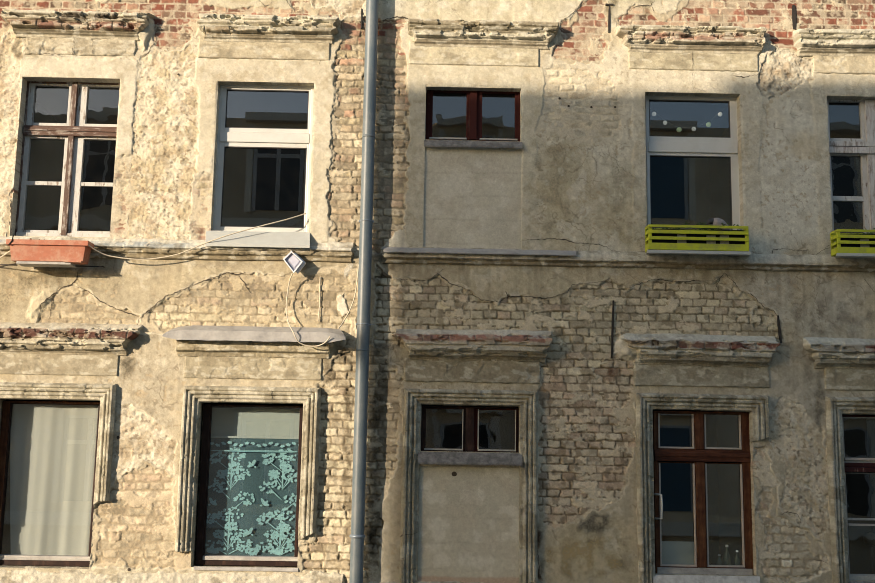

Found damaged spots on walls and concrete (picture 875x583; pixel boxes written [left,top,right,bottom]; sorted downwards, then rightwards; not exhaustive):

flaking render [0,0,366,248]
flaking render [372,18,411,254]
flaking render [543,0,875,144]
crack [38,272,251,325]
flaking render [37,265,358,583]
flaking render [363,265,784,583]